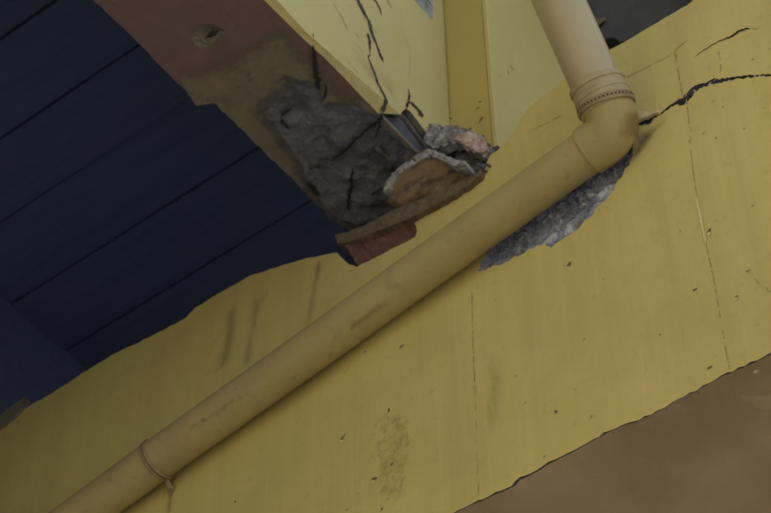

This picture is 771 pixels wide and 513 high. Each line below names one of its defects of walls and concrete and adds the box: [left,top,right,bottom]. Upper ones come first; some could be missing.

crack [280,109,292,131]
crack [307,182,320,197]
crack [311,45,327,103]
crack [330,0,424,213]
spalling [257,75,500,266]
spalling [478,146,633,271]
crack [625,27,771,367]